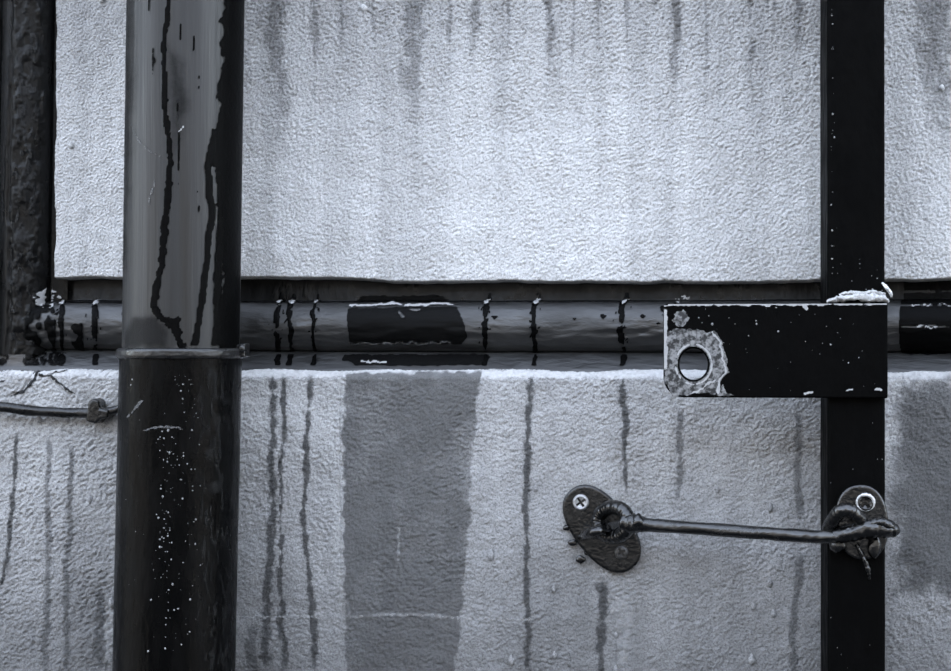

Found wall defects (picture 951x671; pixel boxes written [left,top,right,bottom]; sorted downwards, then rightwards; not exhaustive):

leakage [268,294,296,365]
leakage [308,294,320,365]
leakage [529,293,542,366]
leakage [613,292,632,366]
leakage [0,437,18,585]
leakage [258,377,289,665]
leakage [300,382,318,666]
leakage [340,293,492,671]
leakage [522,379,533,667]
leakage [619,384,630,487]
leakage [596,583,607,671]